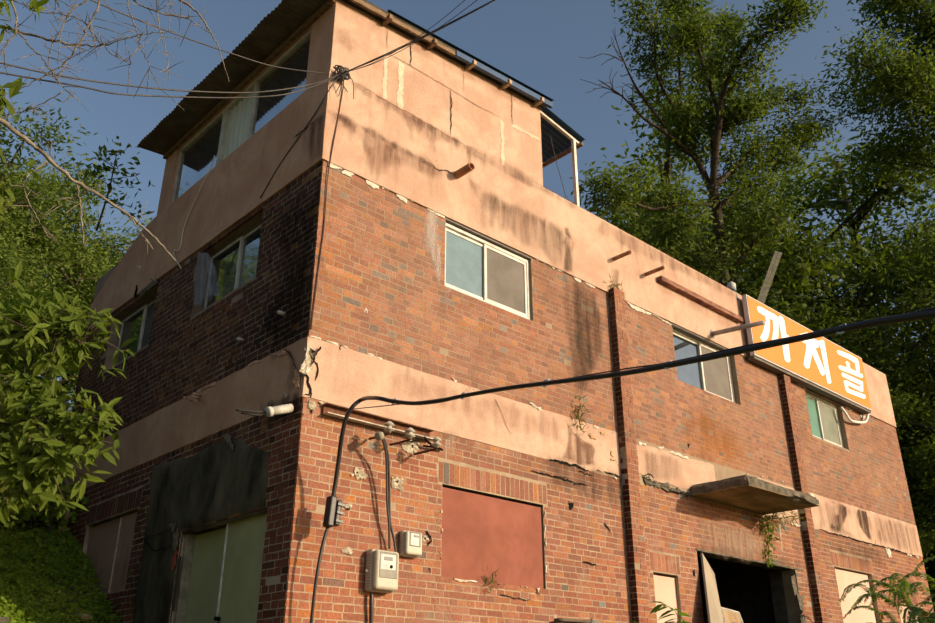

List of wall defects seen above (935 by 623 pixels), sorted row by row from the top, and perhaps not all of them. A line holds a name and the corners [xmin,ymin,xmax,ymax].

crack [354,28,513,147]
flaking render [366,180,414,204]
spalling [299,336,348,374]
leakage [858,510,871,538]